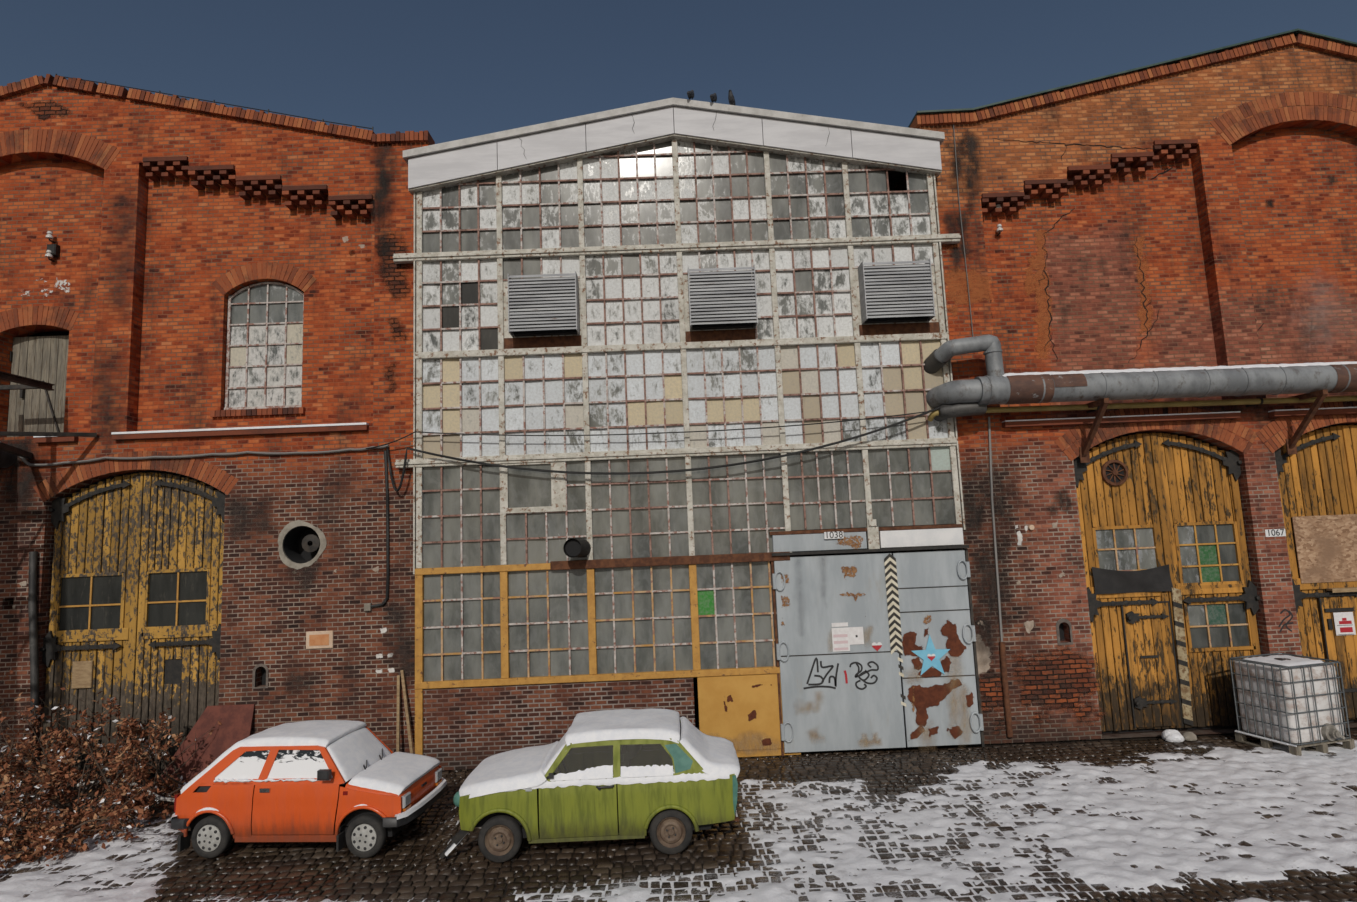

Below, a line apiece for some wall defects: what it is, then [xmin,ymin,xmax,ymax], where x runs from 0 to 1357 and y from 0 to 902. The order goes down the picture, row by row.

water stain [373,143,391,215]
crack [1039,210,1072,361]
corrosion [902,615,974,739]